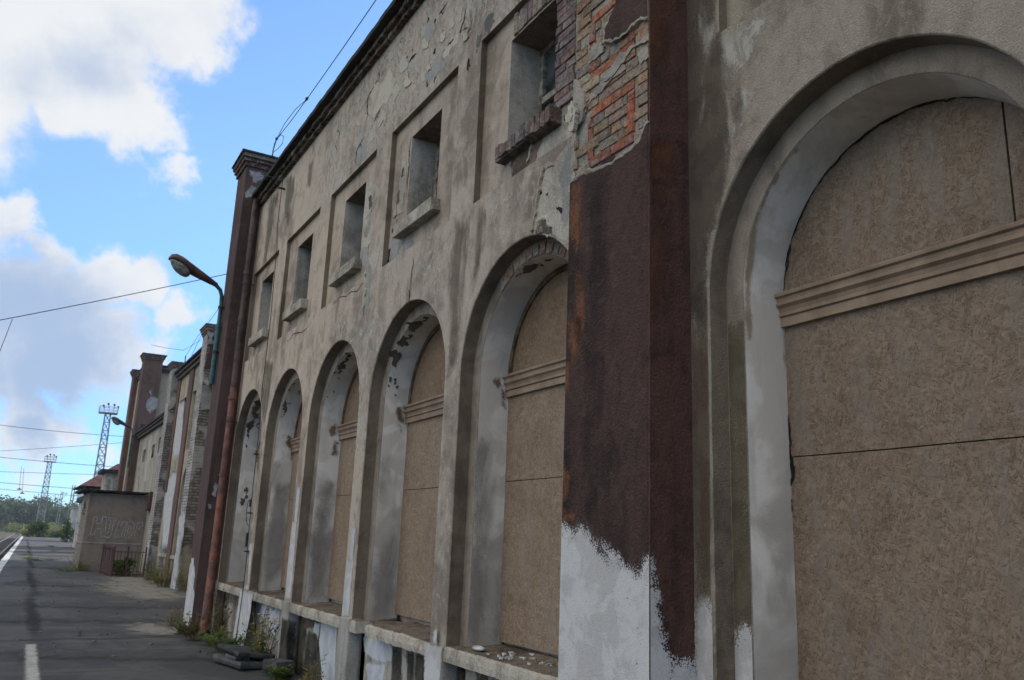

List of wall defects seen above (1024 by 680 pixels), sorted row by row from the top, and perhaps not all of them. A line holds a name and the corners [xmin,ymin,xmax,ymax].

flaking render [356,7,469,166]
flaking render [497,0,649,292]
rust [569,181,582,252]
flaking render [333,352,352,379]
flaking render [387,317,429,395]
flaking render [245,400,261,448]
crack [787,417,795,511]
peeling [486,523,713,680]
peeling [734,621,753,680]